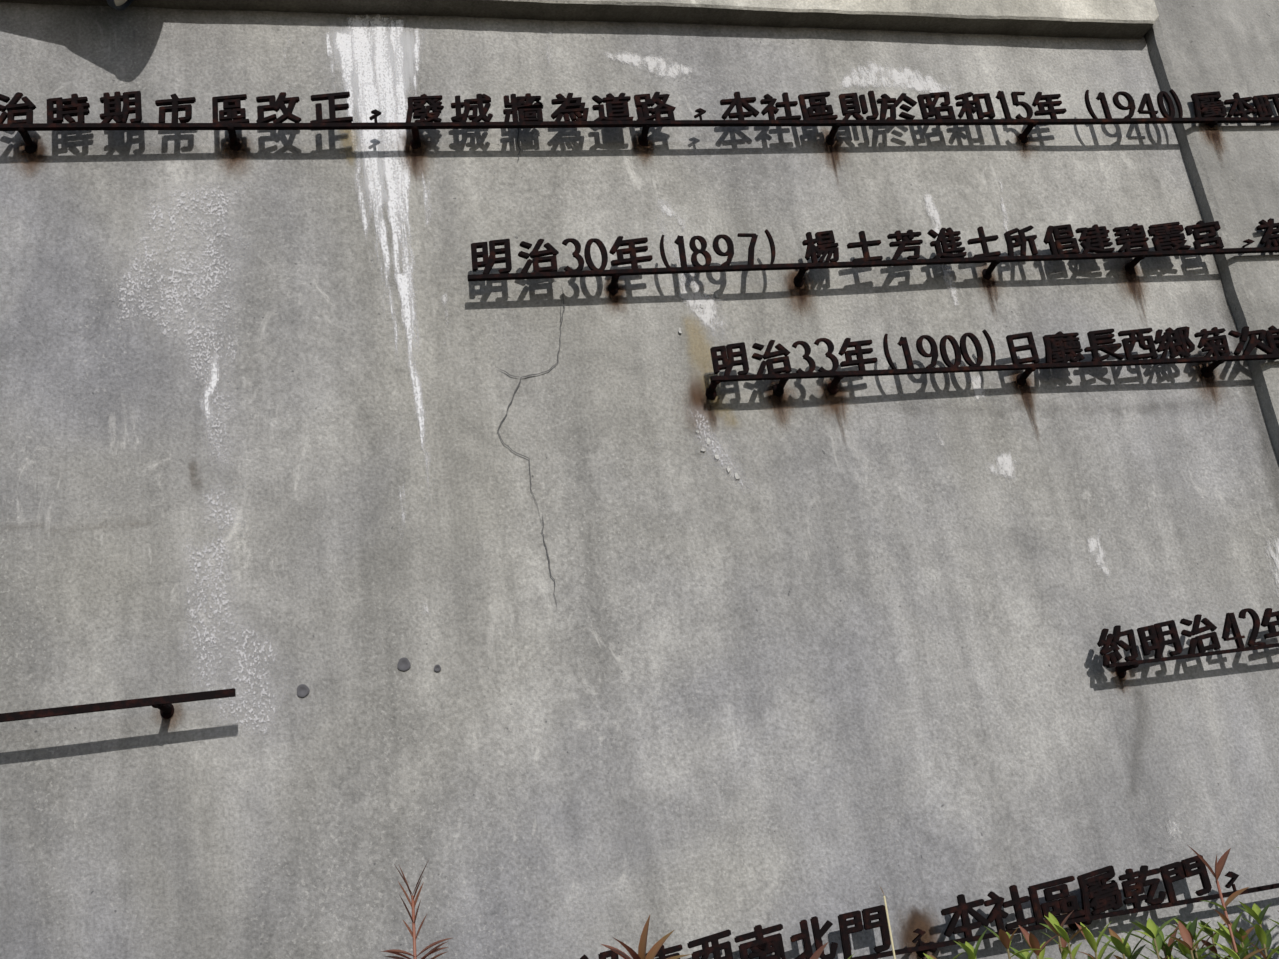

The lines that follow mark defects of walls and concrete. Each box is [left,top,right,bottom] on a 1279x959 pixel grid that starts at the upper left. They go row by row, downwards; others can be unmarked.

corrosion [825,137,839,172]
efflorescence [326,14,428,465]
corrosion [693,385,719,422]
corrosion [1013,372,1037,429]
crack [496,284,565,604]
damp [1267,538,1279,584]